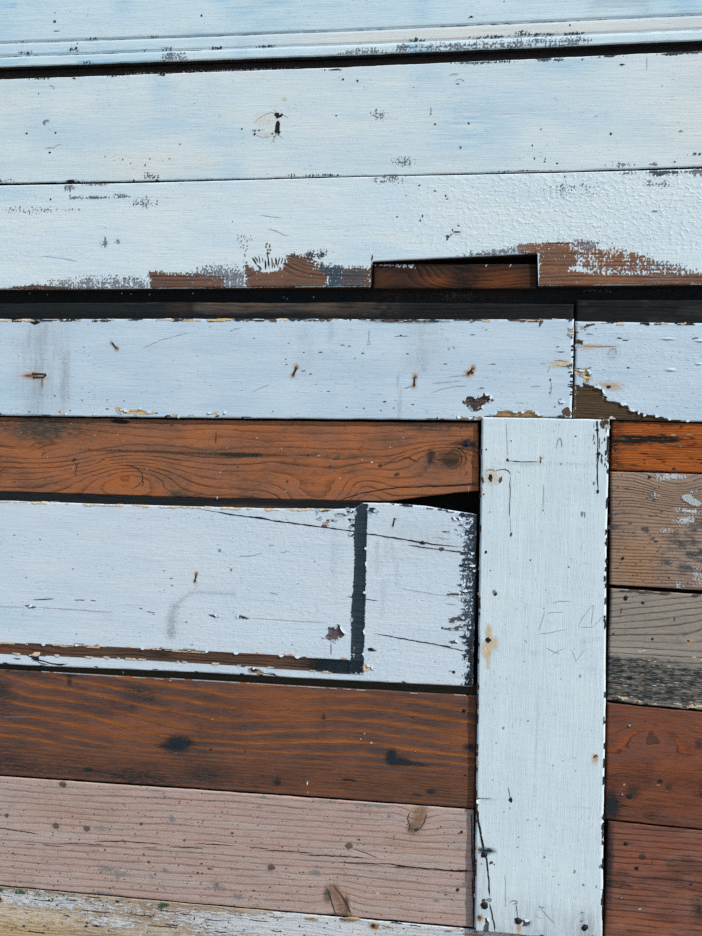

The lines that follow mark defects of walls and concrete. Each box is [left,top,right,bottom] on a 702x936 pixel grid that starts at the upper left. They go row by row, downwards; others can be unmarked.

peeling [9,235,371,290]
peeling [458,238,702,286]
peeling [508,319,690,474]
crack [203,509,471,553]
peeling [322,618,353,643]
peeling [427,507,482,724]